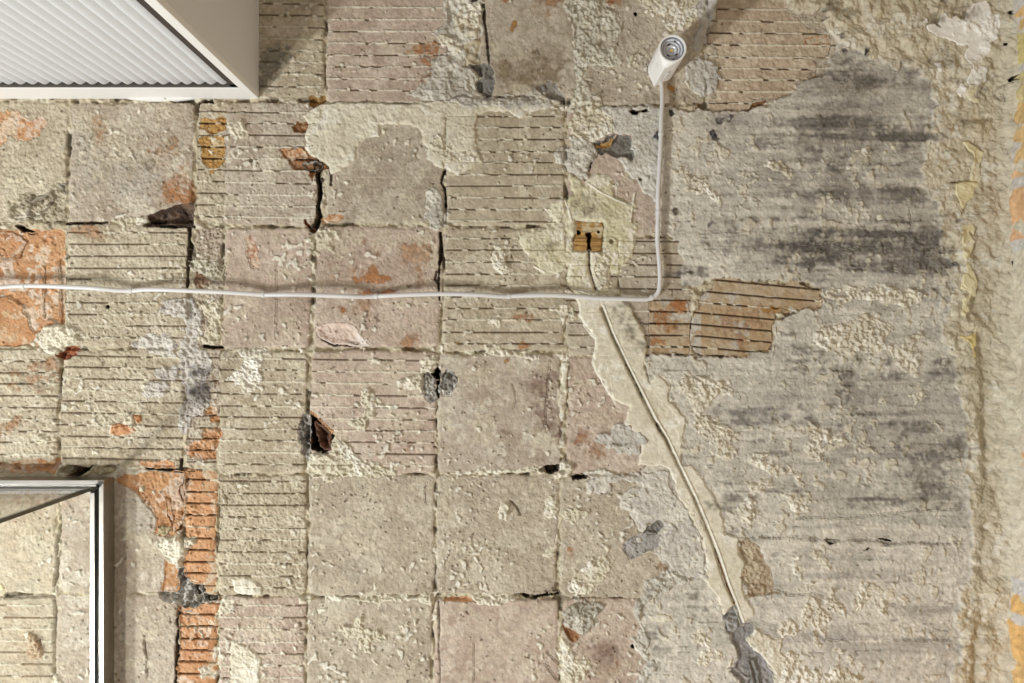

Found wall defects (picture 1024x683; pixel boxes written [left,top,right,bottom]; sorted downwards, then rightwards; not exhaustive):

peeling [279,0,667,202]
water stain [835,59,886,86]
water stain [799,115,936,153]
peeling [923,0,1001,104]
spalling [0,183,69,351]
crack [304,162,333,234]
crack [434,170,447,301]
water stain [776,216,959,275]
spalling [648,277,823,358]
spalling [114,402,223,593]
spalling [175,602,216,683]
spalling [723,606,793,683]